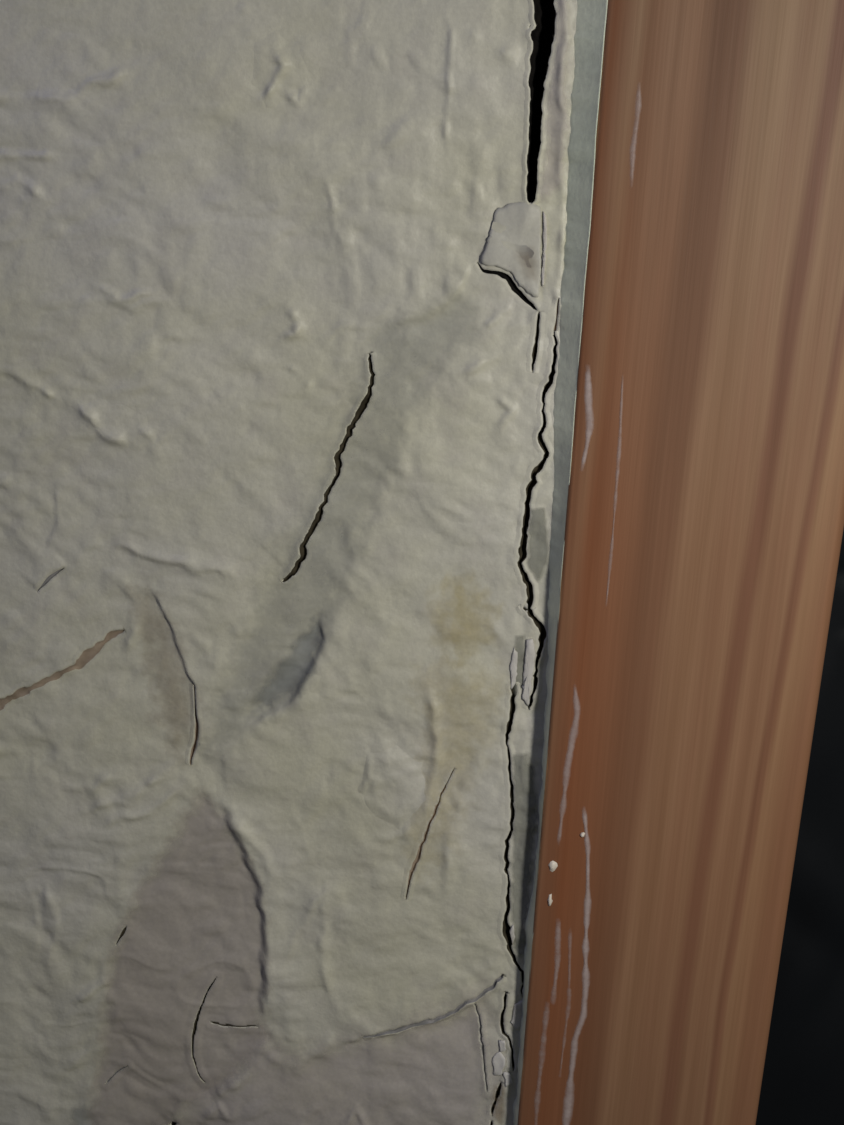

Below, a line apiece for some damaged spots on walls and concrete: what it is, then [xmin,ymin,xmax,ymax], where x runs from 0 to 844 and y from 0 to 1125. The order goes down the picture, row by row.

crack [521,0,562,204]
peeling [473,202,547,314]
crack [278,352,381,586]
crack [0,625,126,716]
crack [361,297,561,1125]
spalling [91,801,264,1125]